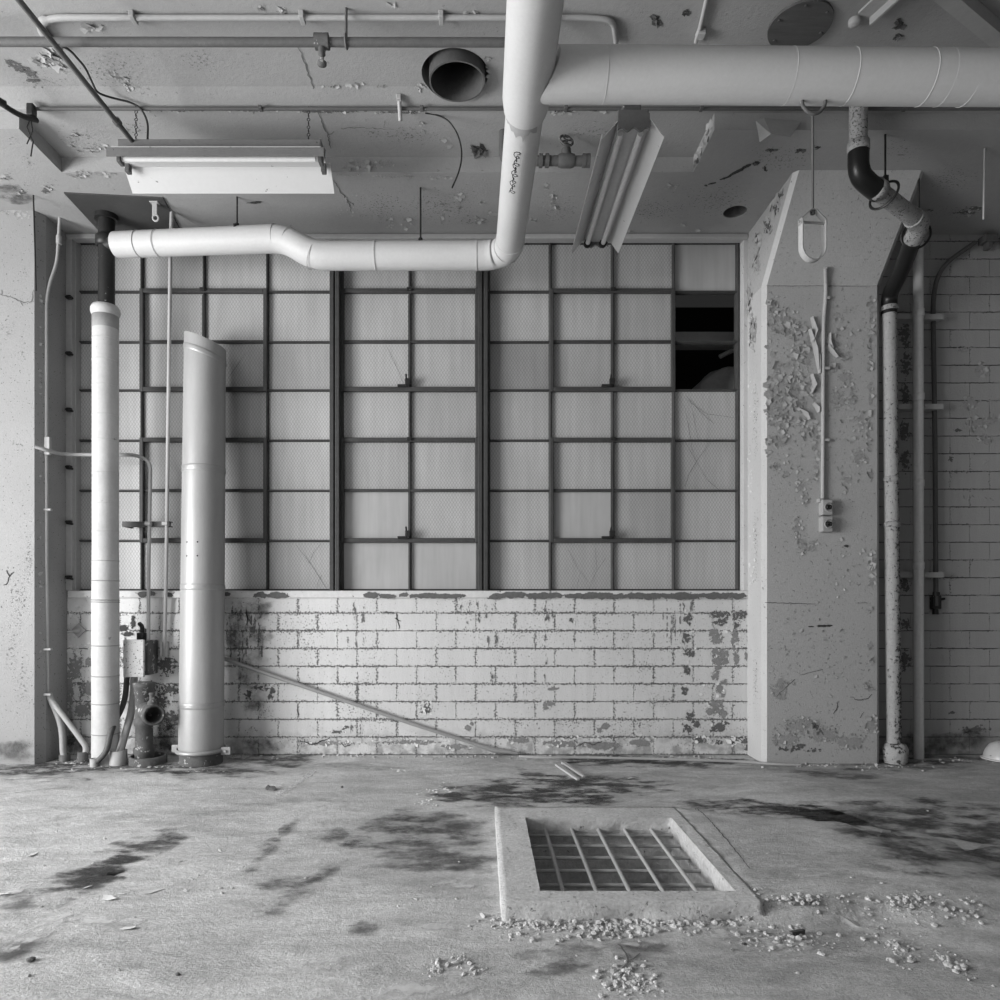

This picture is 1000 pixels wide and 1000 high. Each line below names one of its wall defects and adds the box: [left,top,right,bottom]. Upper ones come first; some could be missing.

peeling [4,47,150,92]
peeling [746,191,877,556]
spalling [67,605,91,720]
peeling [226,591,290,636]
peeling [363,592,493,621]
spalling [487,519,758,751]
peeling [771,714,879,752]
leakage [431,755,739,807]
leakage [42,833,187,891]
leakage [385,815,495,888]